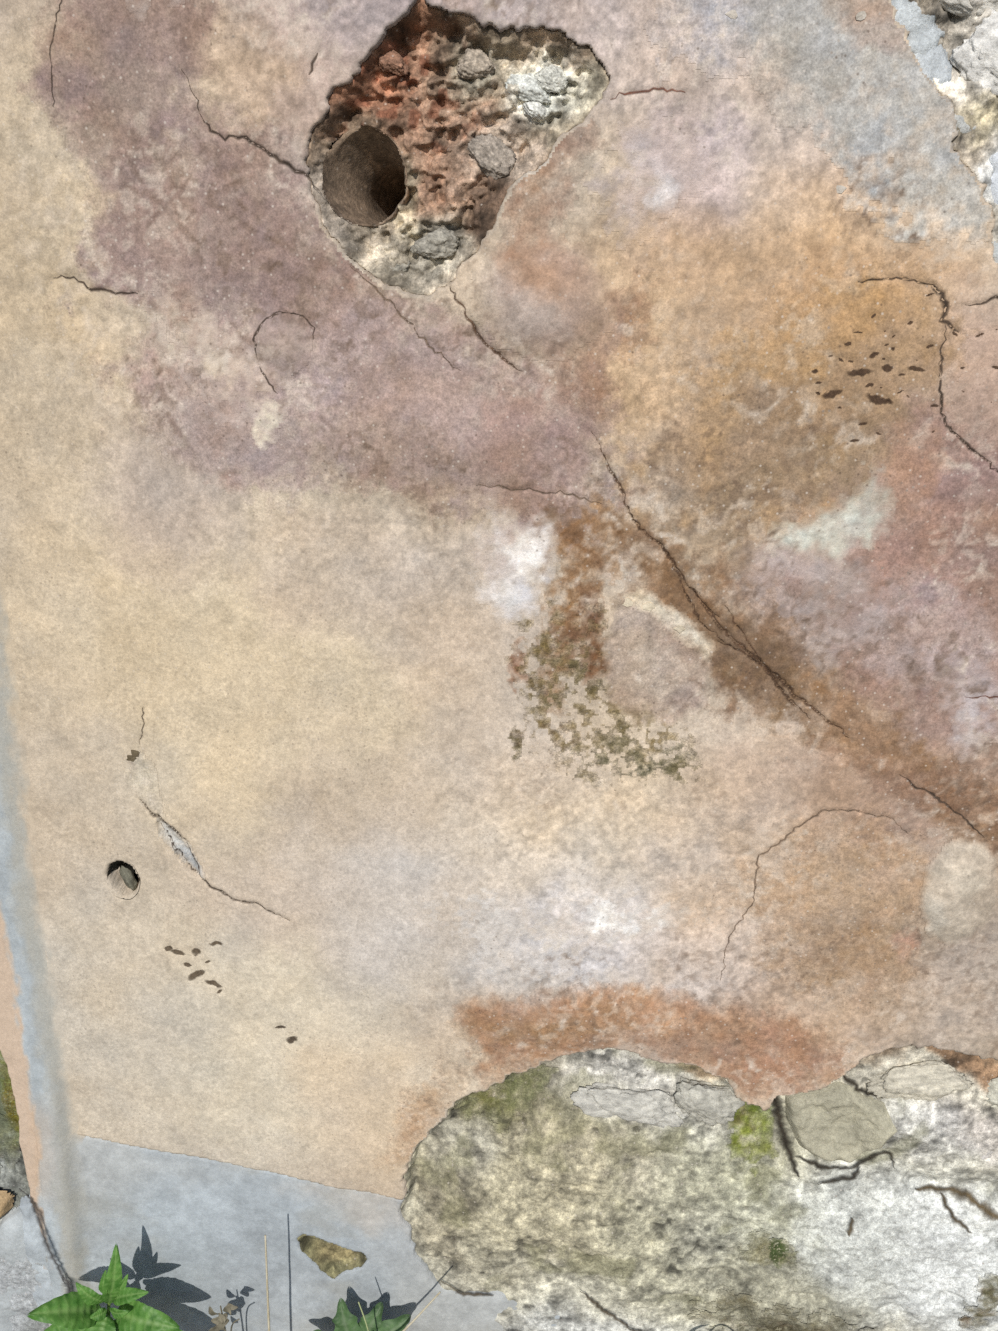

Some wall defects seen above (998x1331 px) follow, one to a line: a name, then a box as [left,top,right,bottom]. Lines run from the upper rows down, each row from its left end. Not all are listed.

crack [182,71,321,193]
spalling [306,0,610,295]
flaking render [643,0,998,263]
spalling [828,330,933,404]
crack [859,277,998,472]
crack [479,443,847,737]
leakage [507,725,525,762]
leakage [552,725,710,785]
crack [140,799,290,921]
rust [371,801,940,1175]
spalling [297,1234,367,1279]
spalling [400,1044,998,1331]